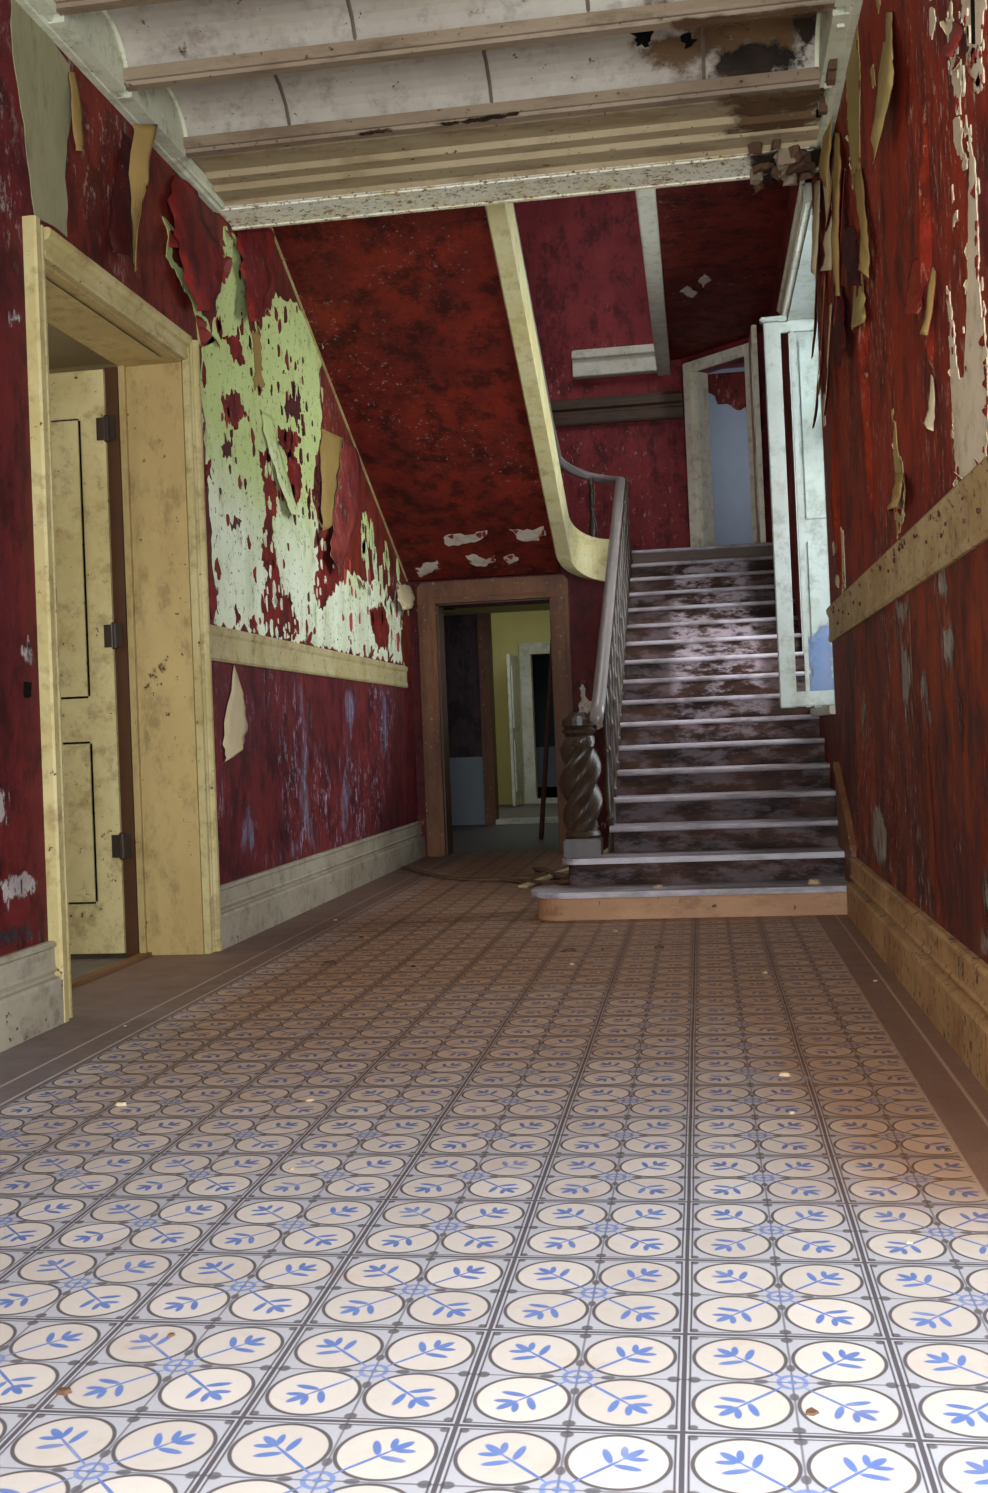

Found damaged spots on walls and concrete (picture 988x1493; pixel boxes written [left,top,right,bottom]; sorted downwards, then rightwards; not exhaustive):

leakage [632,5,824,73]
flaking render [816,23,876,189]
flaking render [832,0,988,625]
flaking render [162,216,546,666]
flaking render [578,680,603,730]